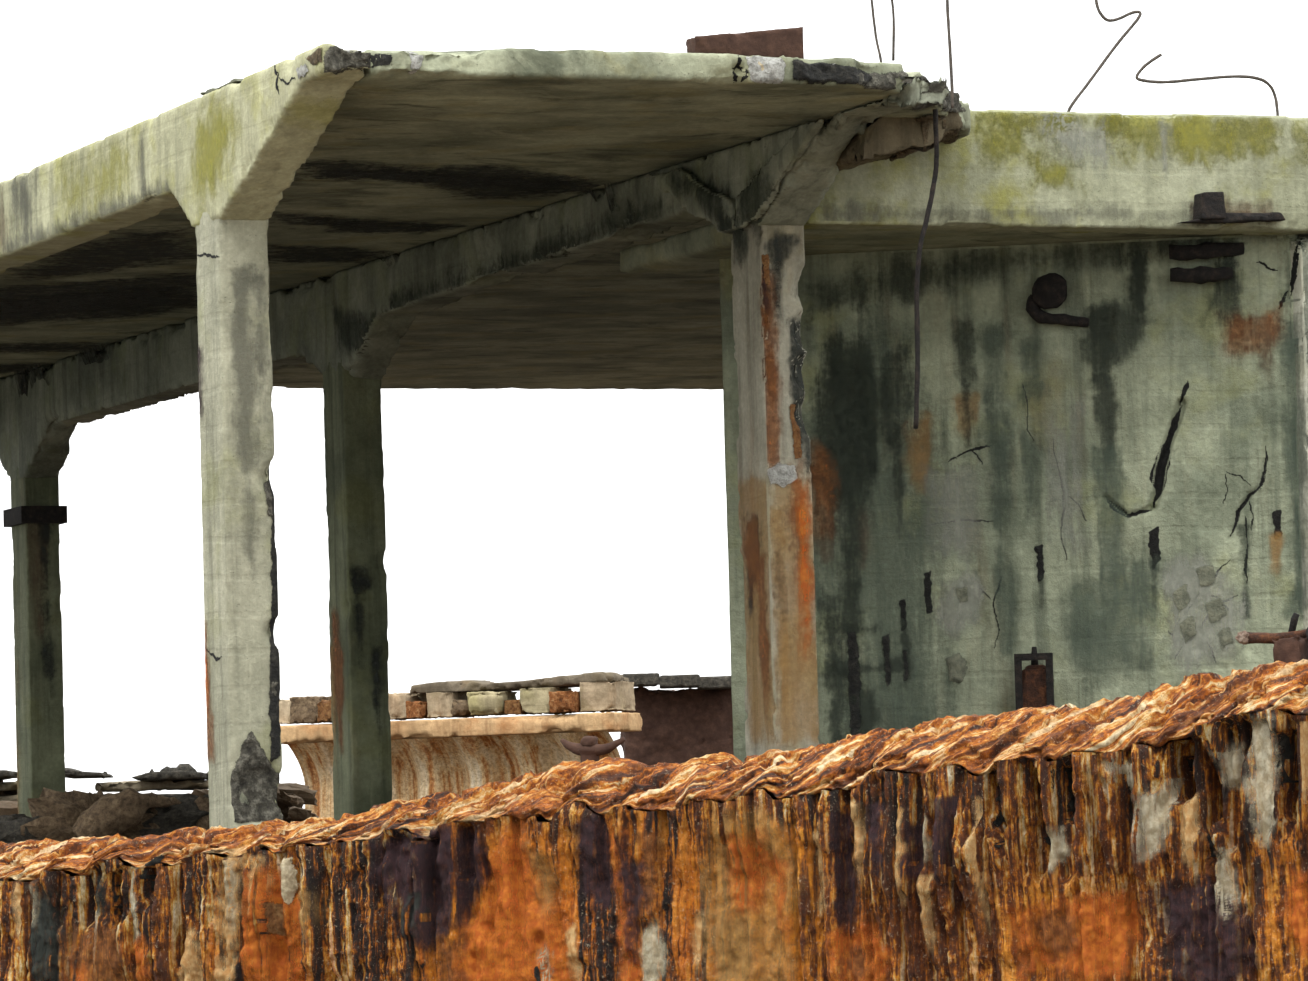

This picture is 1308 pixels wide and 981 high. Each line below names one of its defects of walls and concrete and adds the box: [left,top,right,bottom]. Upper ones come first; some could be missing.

spalling [746,0,966,171]
leakage [7,181,78,251]
leakage [819,248,1025,310]
crack [1256,240,1301,309]
rust [760,263,780,467]
leakage [813,333,936,731]
crack [1022,381,1189,560]
leakage [1043,237,1241,676]
crack [1168,446,1268,662]
rust [364,825,574,981]
rust [900,796,963,902]
rust [1009,874,1257,981]